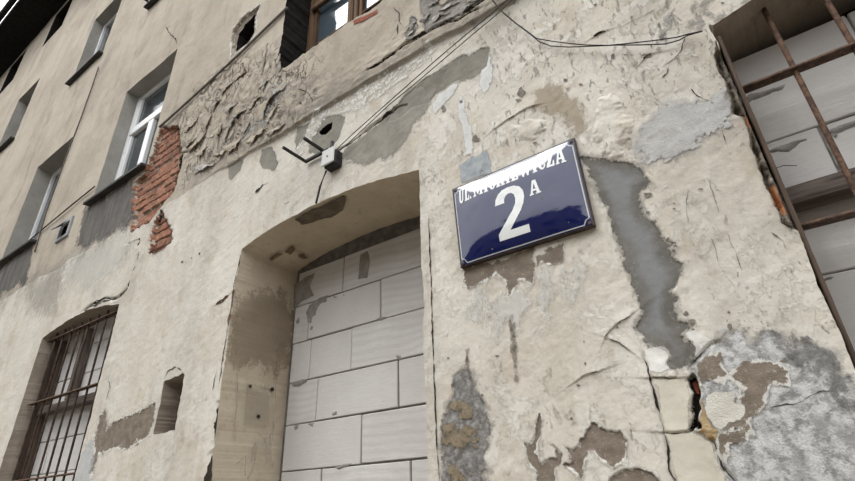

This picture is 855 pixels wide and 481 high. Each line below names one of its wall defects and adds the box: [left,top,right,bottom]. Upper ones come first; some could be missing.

flaking render [129,43,287,254]
damp [294,38,444,162]
damp [342,84,473,164]
flaking render [405,0,482,40]
damp [479,55,493,93]
flaking render [714,41,793,228]
flaking render [460,242,567,299]
flaking render [87,398,159,481]
flaking render [439,355,491,481]
flaking render [522,409,661,481]
crack [605,316,687,481]
peeling [690,311,855,481]